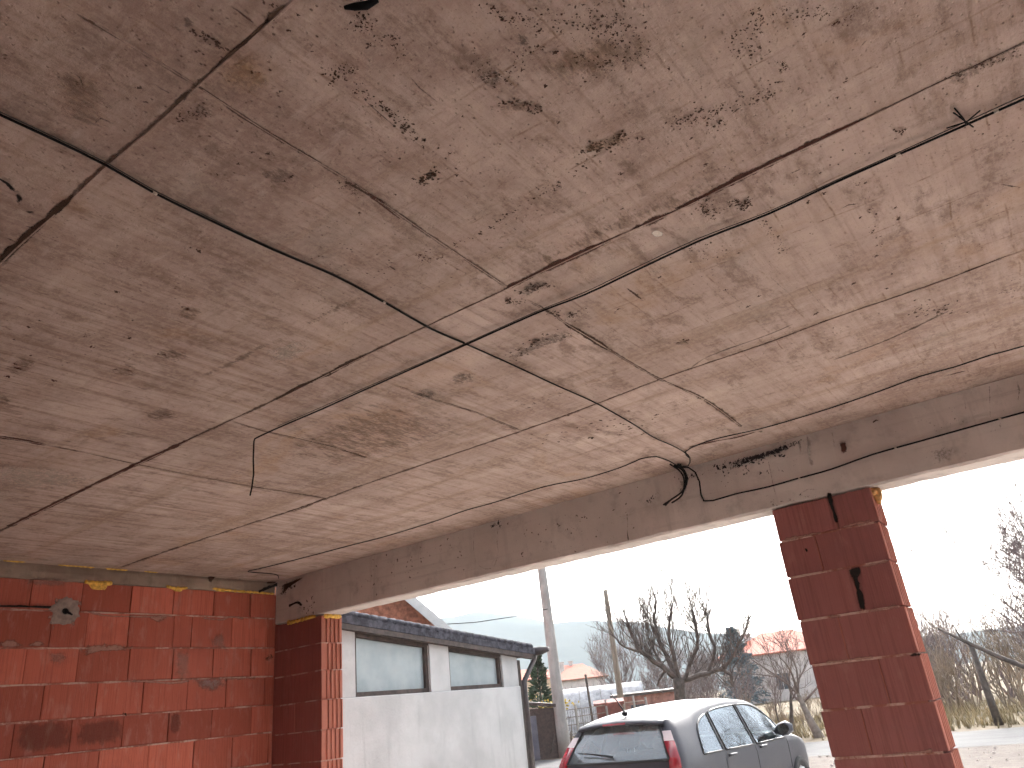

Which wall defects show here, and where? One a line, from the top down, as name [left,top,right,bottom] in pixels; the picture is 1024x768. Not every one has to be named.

water stain [347,0,407,64]
water stain [471,0,658,114]
water stain [665,2,855,140]
water stain [321,63,426,149]
crack [0,179,32,213]
water stain [411,166,440,186]
water stain [578,130,645,163]
rust [637,118,864,228]
water stain [714,439,802,487]